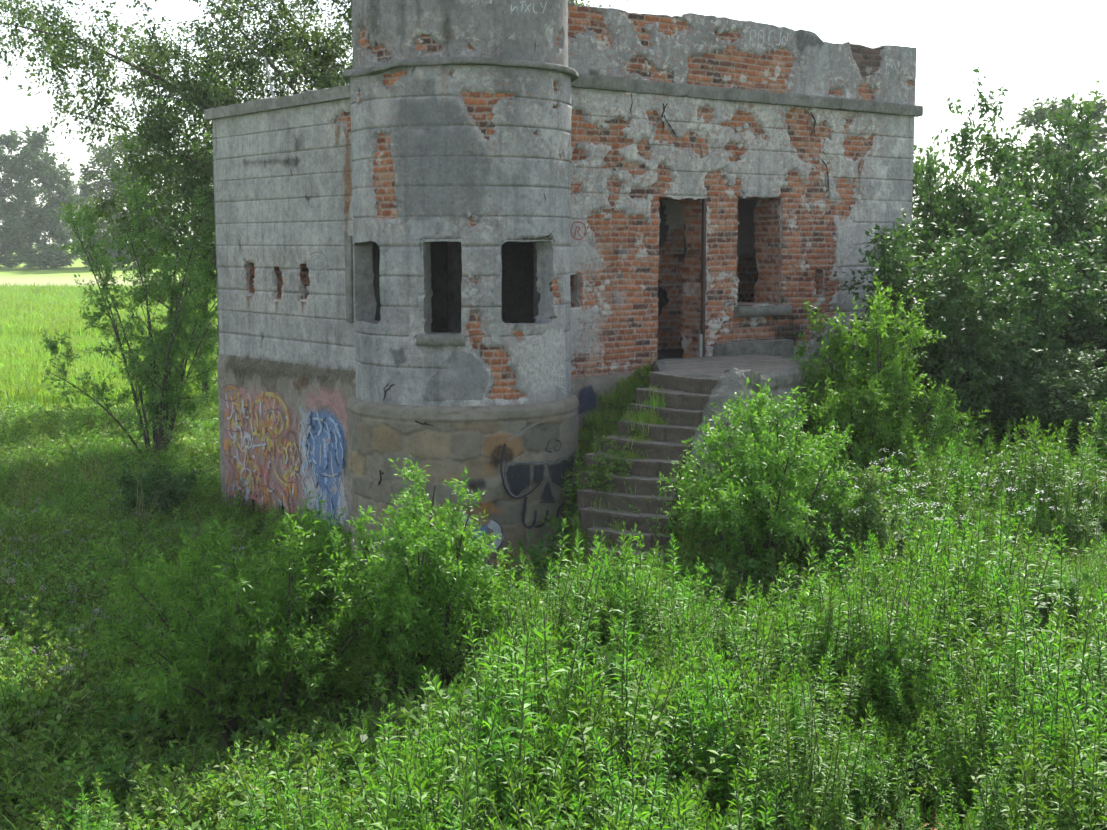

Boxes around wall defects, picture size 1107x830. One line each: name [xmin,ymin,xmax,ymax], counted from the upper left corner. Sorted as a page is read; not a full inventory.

spalling [359,27,415,89]
spalling [414,29,442,54]
spalling [556,5,612,53]
spalling [621,11,793,93]
spalling [850,44,890,101]
spalling [462,91,517,140]
spalling [372,133,399,219]
spalling [552,81,873,377]
spalling [466,311,525,400]